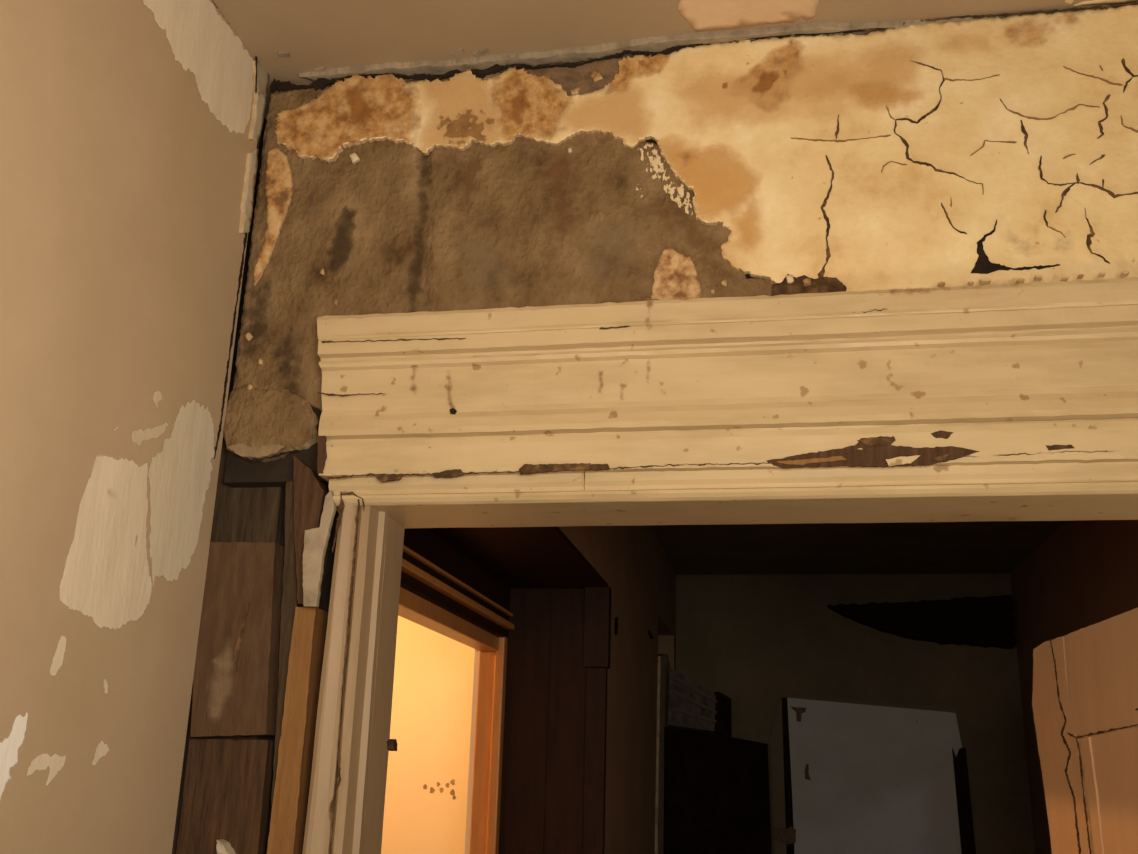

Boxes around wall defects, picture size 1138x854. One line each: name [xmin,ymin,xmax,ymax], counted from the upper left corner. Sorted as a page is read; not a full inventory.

peeling [143,0,254,134]
water stain [425,75,495,149]
water stain [695,54,913,115]
flaking render [233,0,999,411]
crack [791,58,1138,278]
peeling [317,436,327,474]
peeling [767,430,980,469]
peeling [59,399,215,630]
peeling [0,712,66,800]